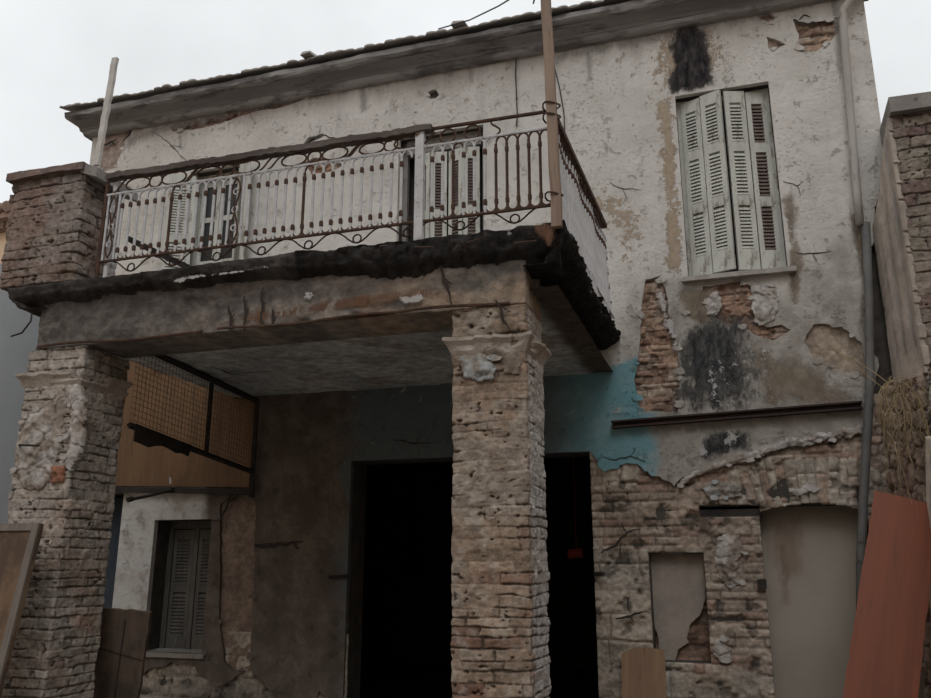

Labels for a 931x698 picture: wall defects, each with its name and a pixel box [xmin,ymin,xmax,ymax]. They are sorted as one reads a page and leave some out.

flaking render [767,37,783,51]
flaking render [794,15,839,52]
flaking render [703,280,790,340]
damp [657,289,850,412]
damp [719,423,739,453]
crack [601,523,640,557]
flaking render [589,394,893,698]
flaking render [140,488,275,698]